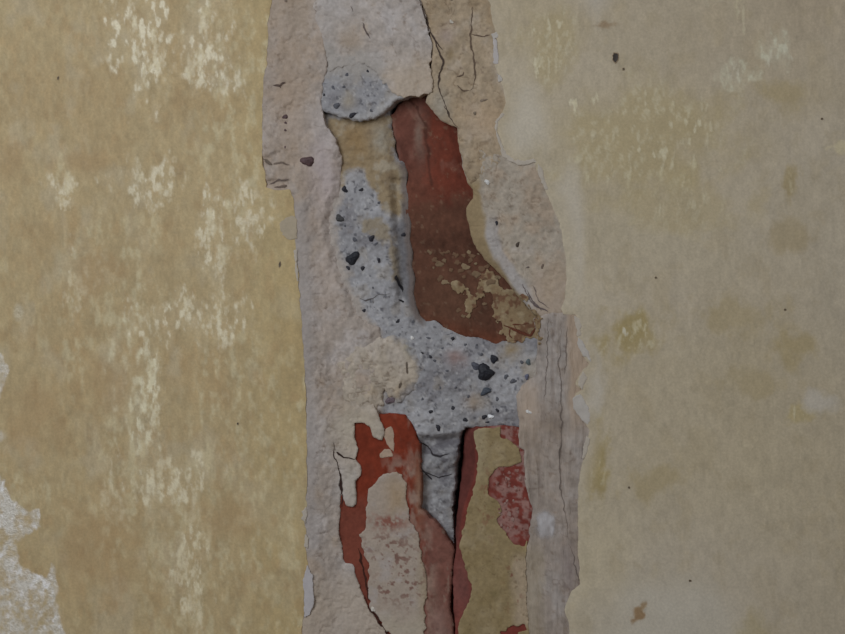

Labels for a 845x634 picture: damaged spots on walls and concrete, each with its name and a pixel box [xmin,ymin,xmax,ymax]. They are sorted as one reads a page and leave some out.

crack [419,0,488,129]
flaking render [262,0,424,634]
flaking render [421,0,591,634]
crack [333,443,355,505]
crack [358,549,389,634]
rust [627,600,649,626]